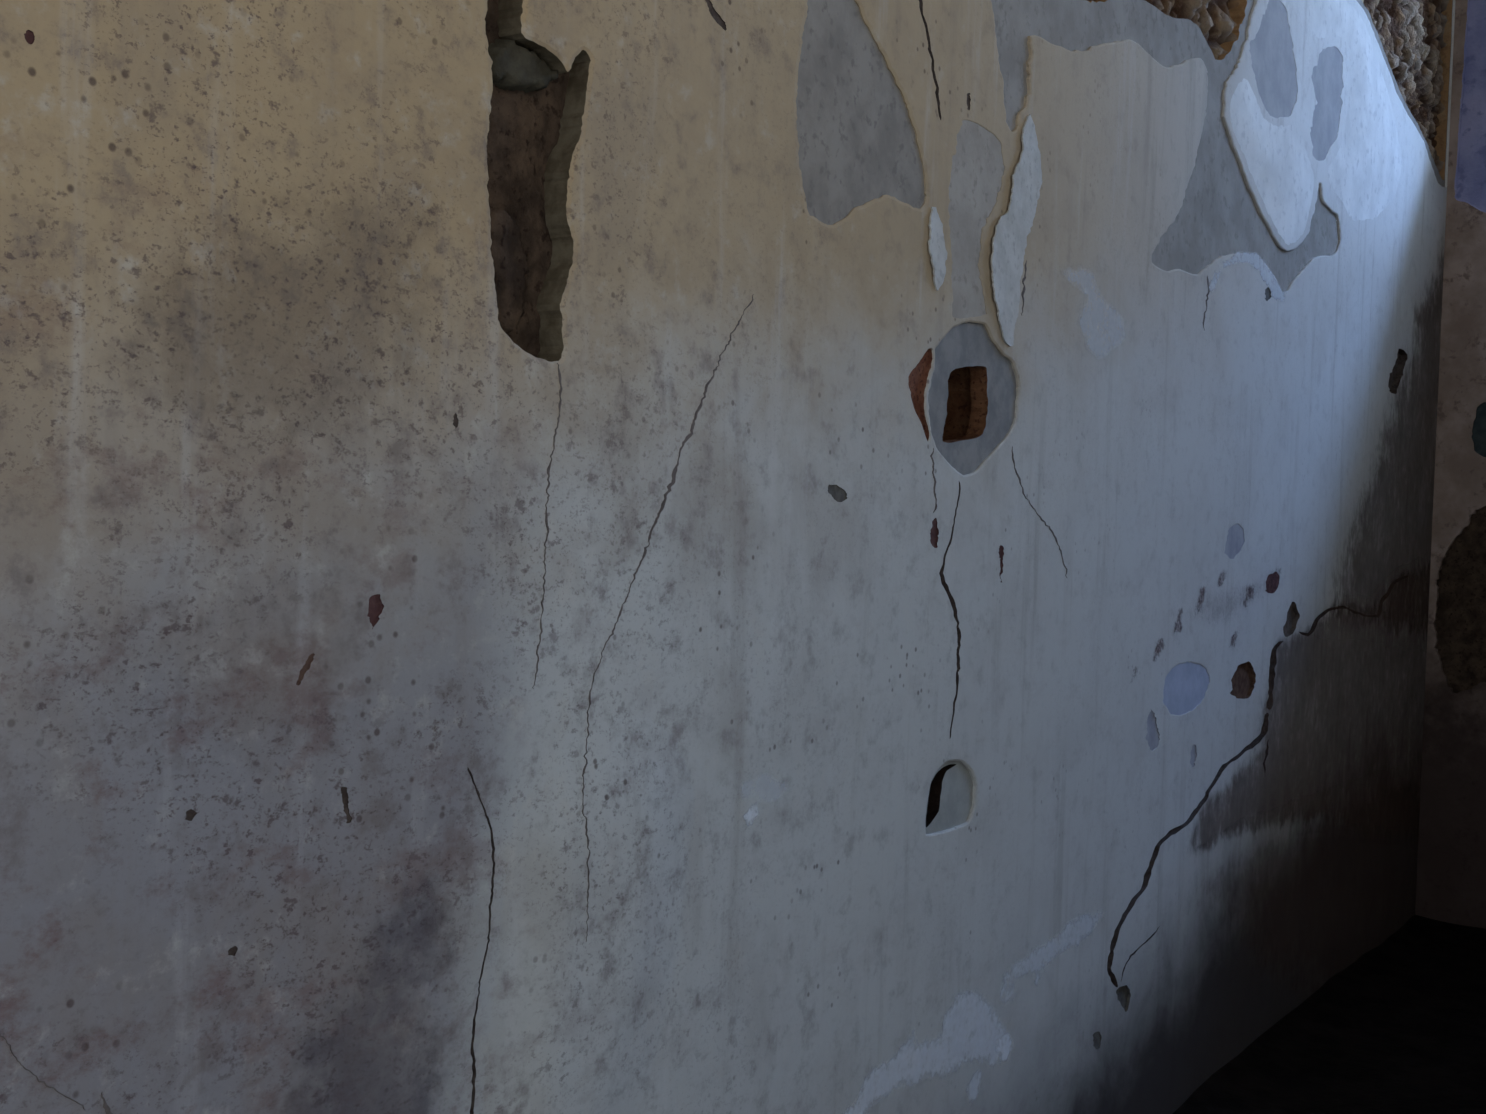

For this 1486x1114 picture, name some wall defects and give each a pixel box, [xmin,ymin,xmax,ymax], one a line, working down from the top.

spalling [481,0,595,365]
spalling [793,0,948,291]
spalling [908,0,1342,477]
flaking render [1356,0,1486,213]
crack [467,768,495,1114]
crack [582,294,754,941]
crack [930,448,961,738]
water stain [845,915,1098,1114]
crack [1012,446,1067,578]
crack [1107,587,1391,987]
water stain [1193,253,1444,848]
spalling [1431,504,1486,696]